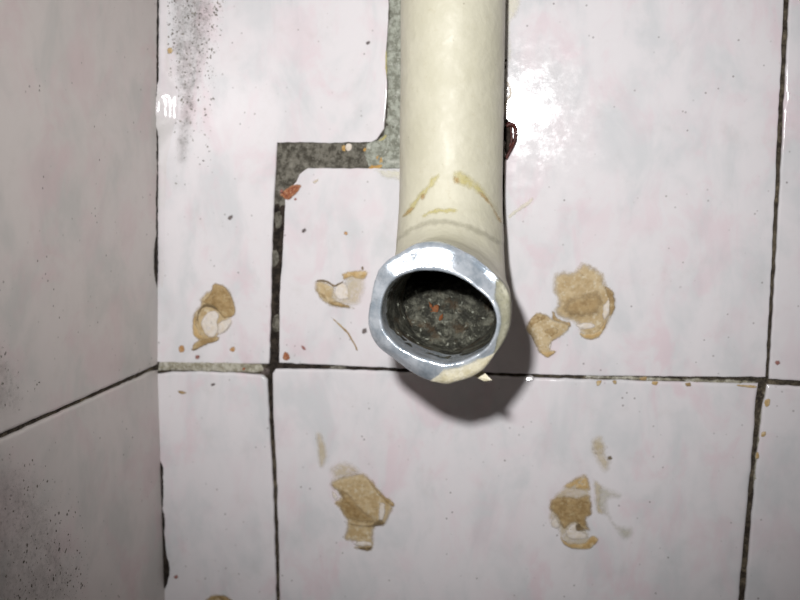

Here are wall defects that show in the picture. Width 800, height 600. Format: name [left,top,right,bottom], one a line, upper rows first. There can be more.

leakage [167,0,225,142]
peeling [191,284,235,351]
peeling [316,267,367,308]
peeling [526,265,615,357]
peeling [332,474,394,550]
peeling [550,475,598,549]